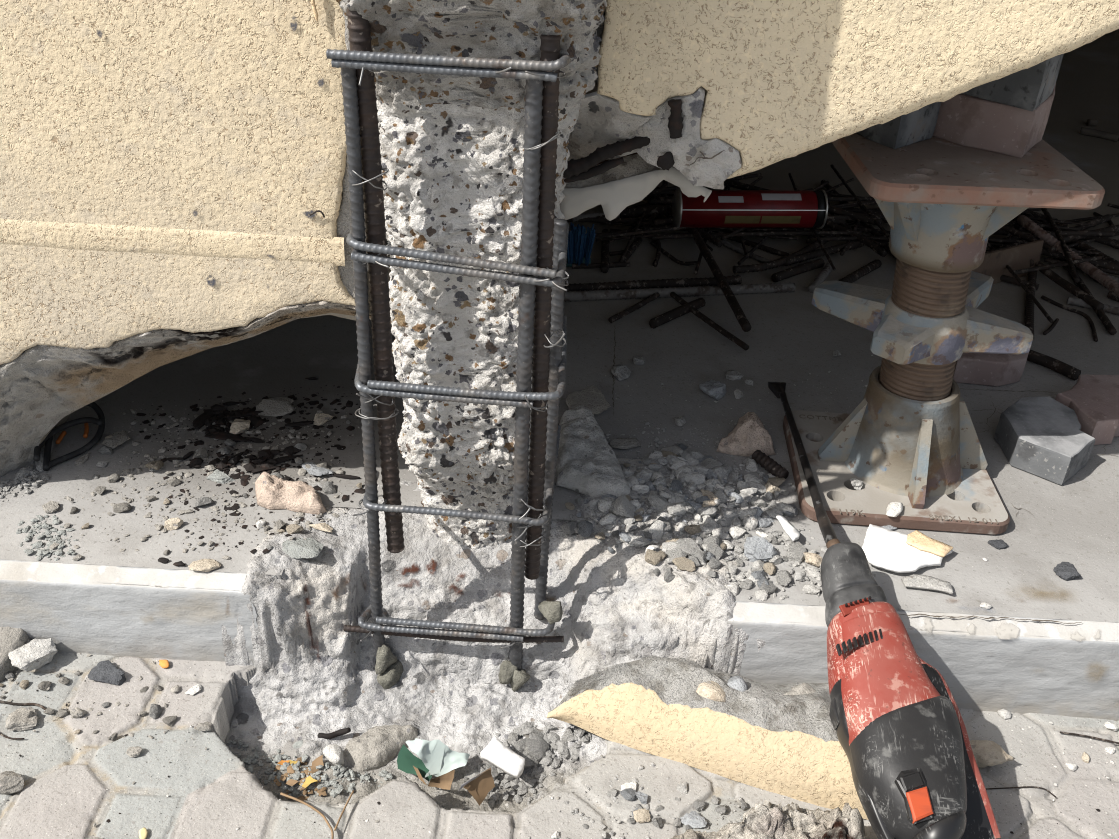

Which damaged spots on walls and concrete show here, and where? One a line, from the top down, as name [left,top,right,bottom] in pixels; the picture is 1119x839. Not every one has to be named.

corrosion [346,0,373,52]
spalling [336,0,741,221]
corrosion [356,69,394,382]
spalling [0,155,371,478]
corrosion [525,34,561,580]
peeling [206,469,235,484]
corrosion [304,586,318,655]
peeling [309,523,333,532]
corrosion [376,395,405,553]
corrosion [401,560,436,587]